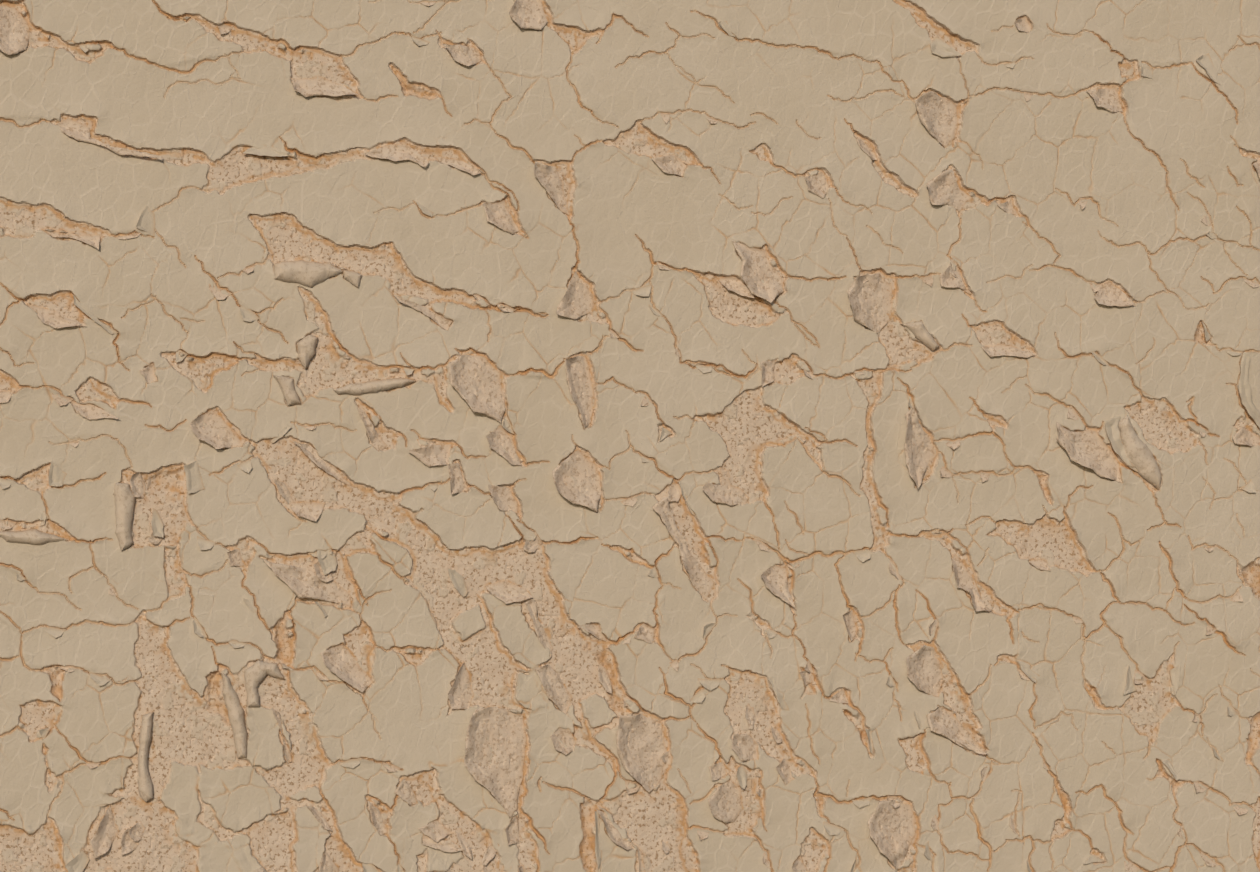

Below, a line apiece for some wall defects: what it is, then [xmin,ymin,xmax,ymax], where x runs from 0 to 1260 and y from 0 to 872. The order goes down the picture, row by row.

peeling [0,0,111,65]
crack [1,0,262,100]
peeling [54,113,531,240]
peeling [165,12,454,118]
crack [463,8,902,167]
crack [966,22,1260,312]
peeling [672,0,1260,793]
crack [0,495,277,688]
peeling [0,159,822,872]
crack [515,518,732,724]
crack [811,456,1256,872]
peeling [791,827,837,872]